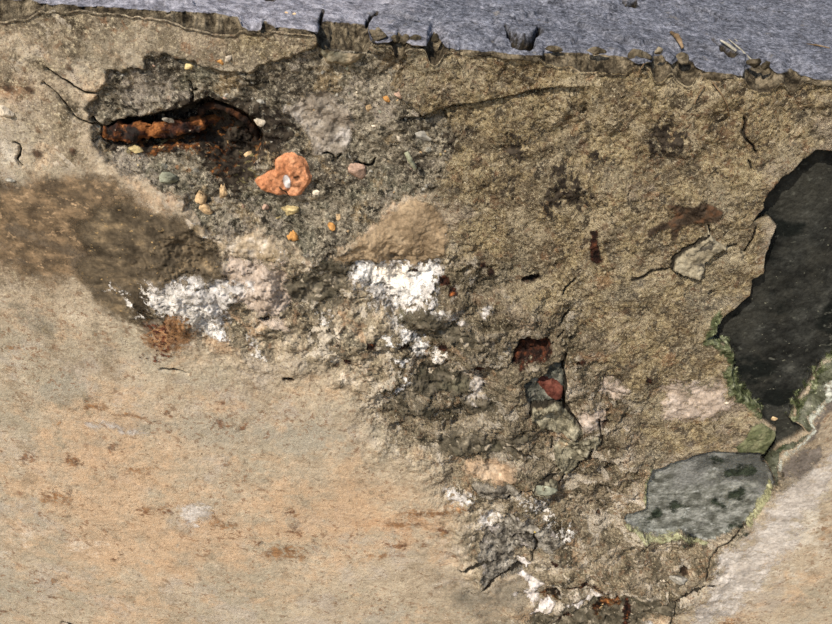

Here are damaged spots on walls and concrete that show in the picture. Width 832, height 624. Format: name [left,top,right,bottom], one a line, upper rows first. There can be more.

corrosion [93,91,300,199]
spalling [83,44,458,331]
leakage [76,199,255,352]
leakage [281,258,507,421]
corrosion [512,337,553,372]
spalling [625,150,832,540]
leakage [432,426,542,460]
flaking render [461,457,516,485]
flaking render [579,410,609,433]
spalling [476,513,566,615]
peeling [567,589,602,609]
crack [670,514,754,623]